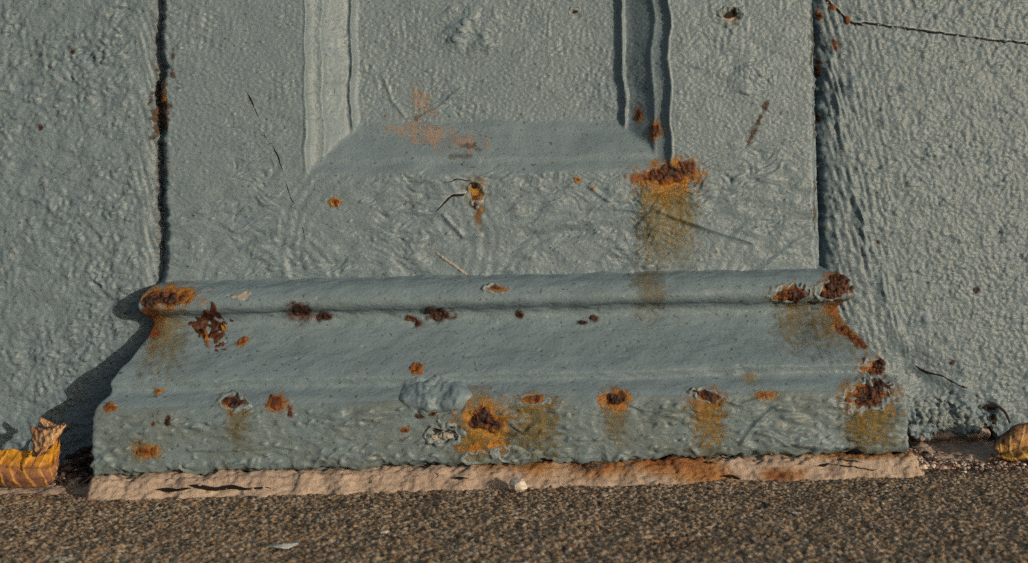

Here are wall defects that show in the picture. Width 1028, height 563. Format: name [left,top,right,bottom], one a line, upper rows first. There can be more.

crack [825,0,1028,45]
rust [464,177,486,223]
rust [631,158,706,268]
rust [141,284,195,357]
rust [288,302,333,321]
rust [405,307,456,327]
rust [765,272,906,458]
rust [452,392,561,473]
rust [569,386,732,482]